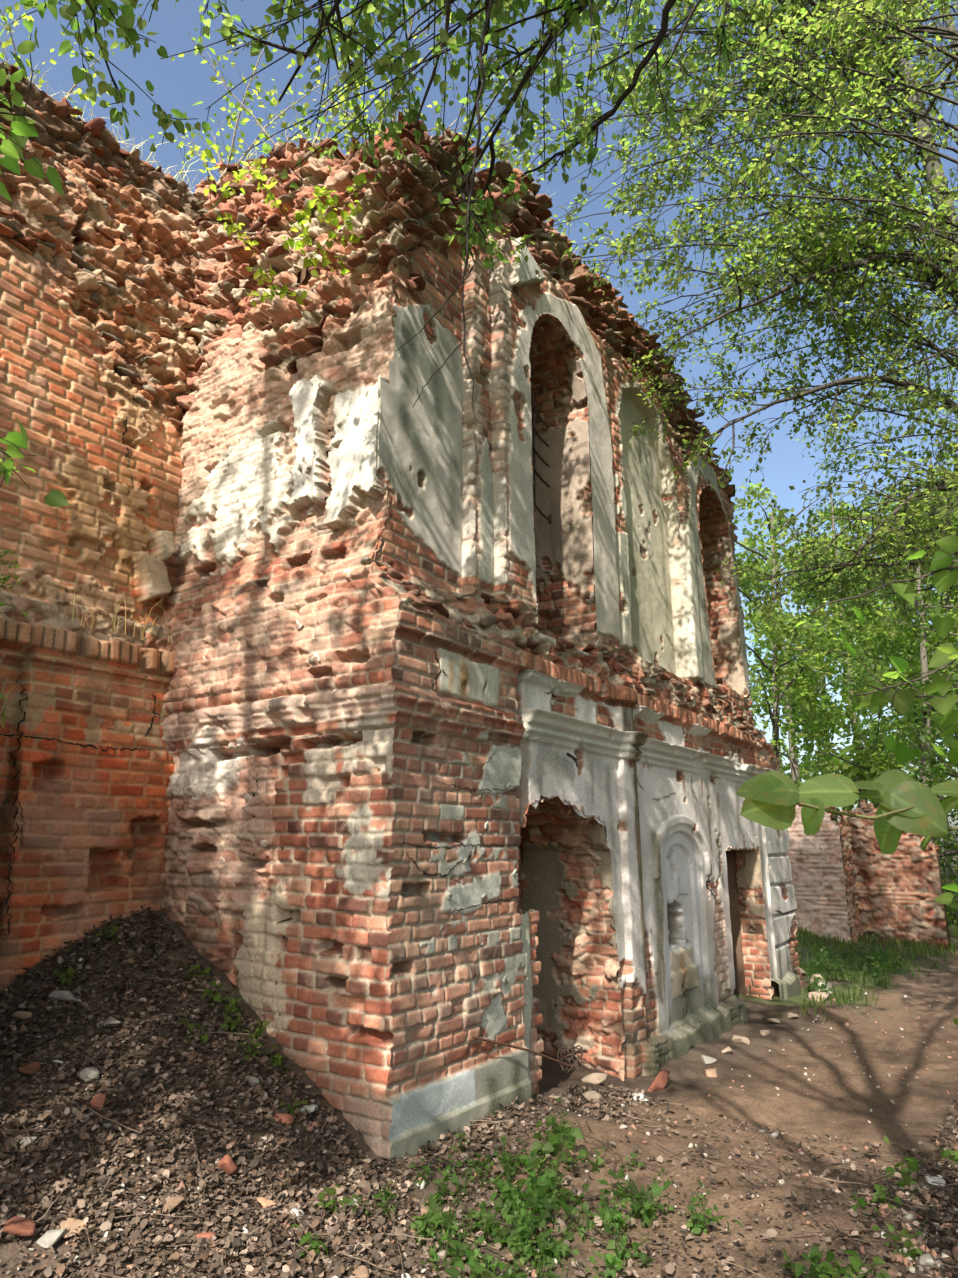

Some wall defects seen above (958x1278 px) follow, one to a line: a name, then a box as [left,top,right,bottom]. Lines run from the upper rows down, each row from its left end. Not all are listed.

spalling [0,67,781,773]
crack [0,673,163,957]
crack [396,842,520,914]
peeling [616,927,670,1079]